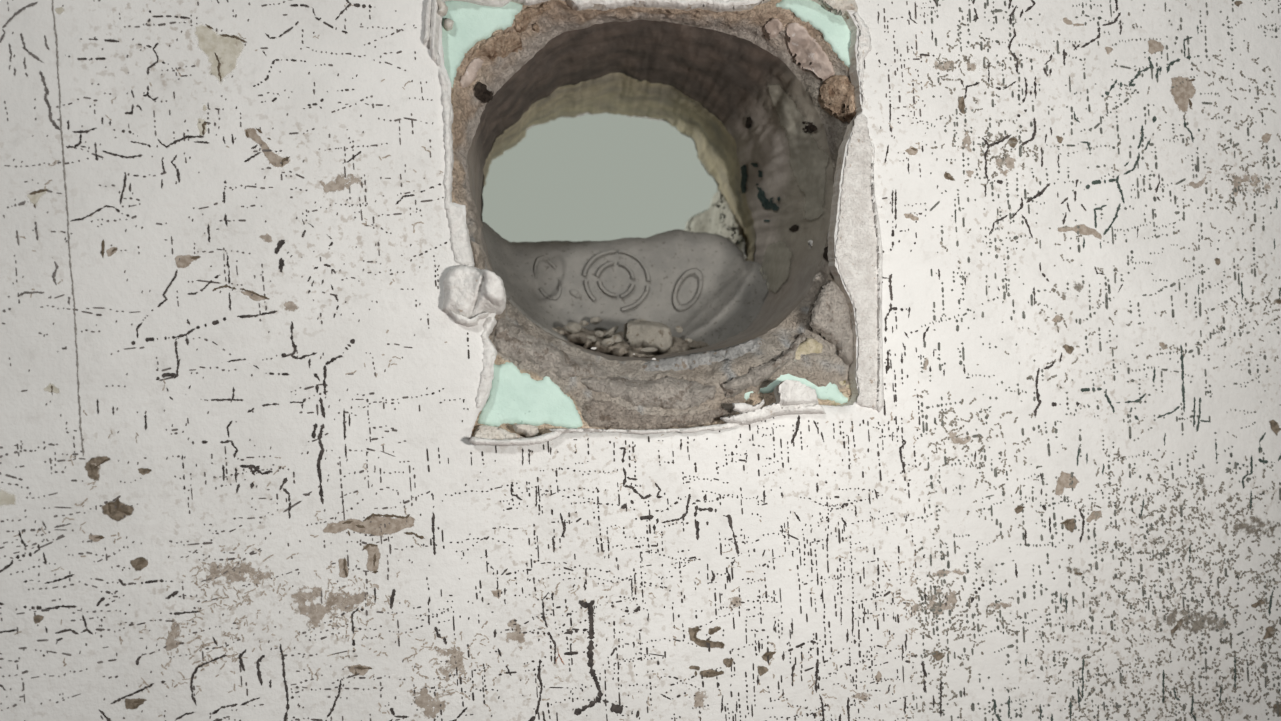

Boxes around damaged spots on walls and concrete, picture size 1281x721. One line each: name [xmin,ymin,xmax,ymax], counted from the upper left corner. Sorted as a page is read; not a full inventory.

crack [0,0,249,242]
crack [188,144,308,222]
peeling [245,128,290,167]
crack [236,0,447,329]
spalling [451,0,852,440]
peeling [1171,76,1196,112]
crack [188,214,277,322]
crack [18,270,259,400]
crack [0,414,85,499]
peeling [85,456,111,481]
peeling [323,513,425,574]
peeling [291,557,367,626]